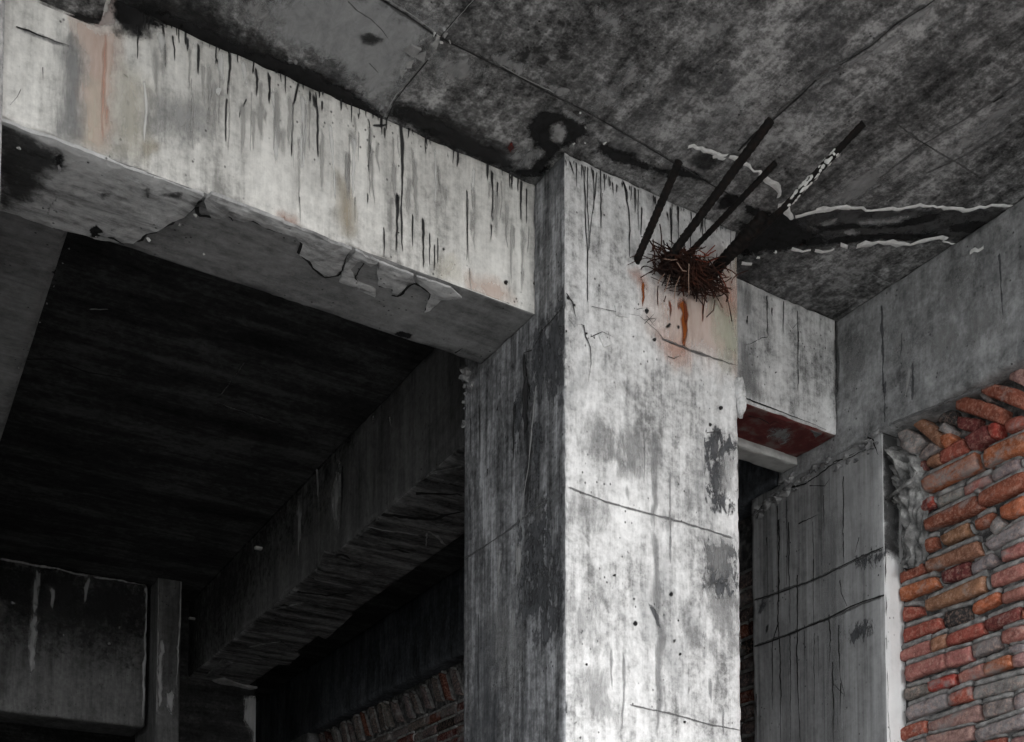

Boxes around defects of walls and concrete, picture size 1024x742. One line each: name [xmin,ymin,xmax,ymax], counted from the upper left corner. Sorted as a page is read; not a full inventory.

leakage [0,125,63,209]
peeling [0,118,462,313]
leakage [42,0,1019,301]
spalling [634,159,683,265]
spalling [658,117,777,274]
spalling [709,120,866,278]
corrosion [669,274,734,355]
leakage [704,426,738,516]
leakage [702,538,738,627]
crack [756,476,859,742]